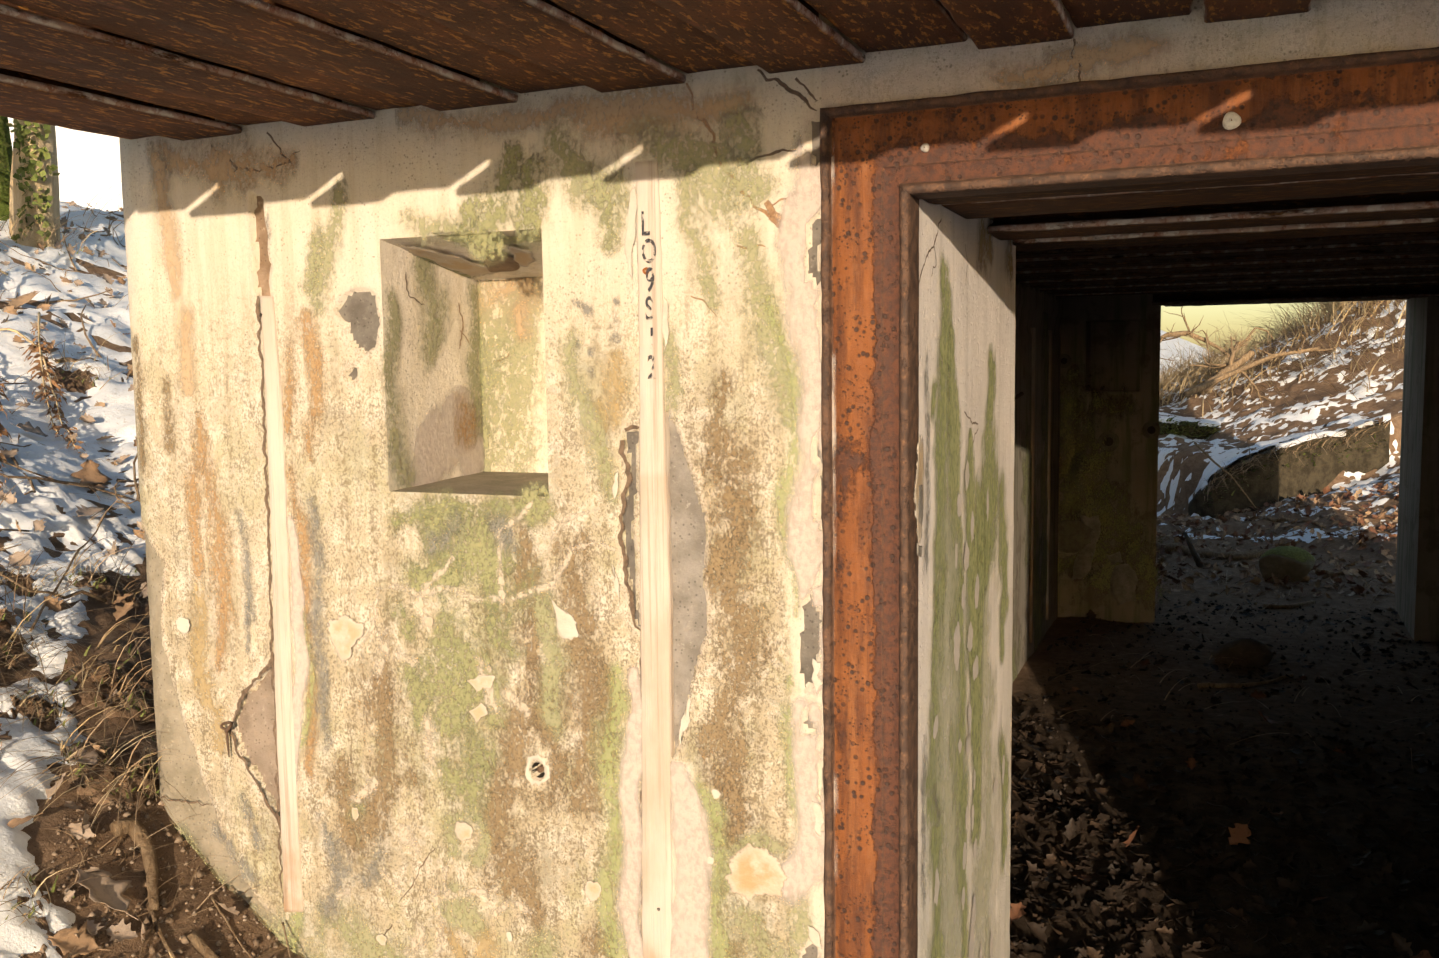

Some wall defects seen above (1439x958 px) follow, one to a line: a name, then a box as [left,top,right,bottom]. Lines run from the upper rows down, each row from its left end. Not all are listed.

crack [757,69,818,111]
rust [132,337,145,471]
rust [185,416,234,755]
spalling [145,532,304,955]
rust [283,310,323,460]
spalling [339,291,380,351]
water stain [382,256,565,745]
spalling [668,415,707,753]
water stain [670,677,835,958]
water stain [777,140,835,659]
spalling [800,594,823,693]
water stain [922,258,1167,958]